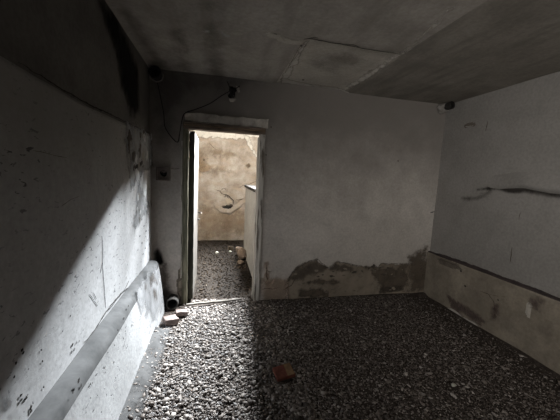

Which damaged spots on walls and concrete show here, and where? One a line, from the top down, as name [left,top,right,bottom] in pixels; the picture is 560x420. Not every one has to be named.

crack [285,37,396,73]
leakage [292,262,352,298]
spalling [286,259,424,299]
leakage [365,246,428,294]